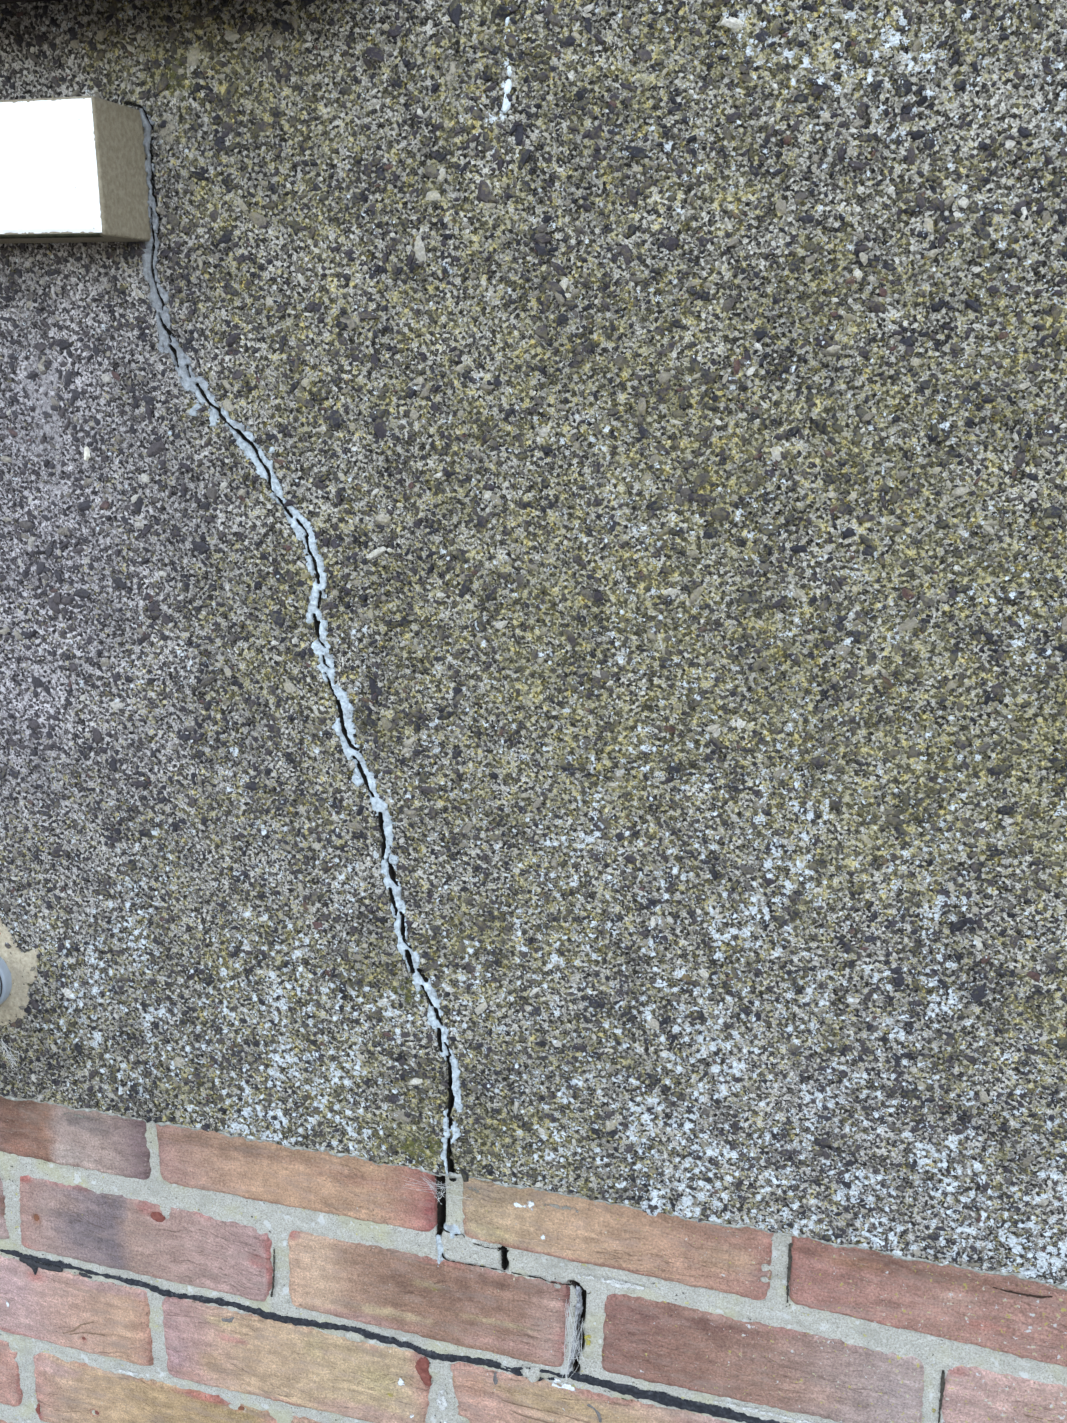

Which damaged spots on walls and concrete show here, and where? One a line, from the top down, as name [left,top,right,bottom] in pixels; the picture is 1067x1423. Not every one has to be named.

crack [123,101,463,1182]
crack [268,1249,276,1297]
crack [440,1227,571,1286]
crack [785,1243,793,1303]
crack [993,1287,1053,1299]
crack [502,1400,589,1423]
crack [937,1370,945,1423]